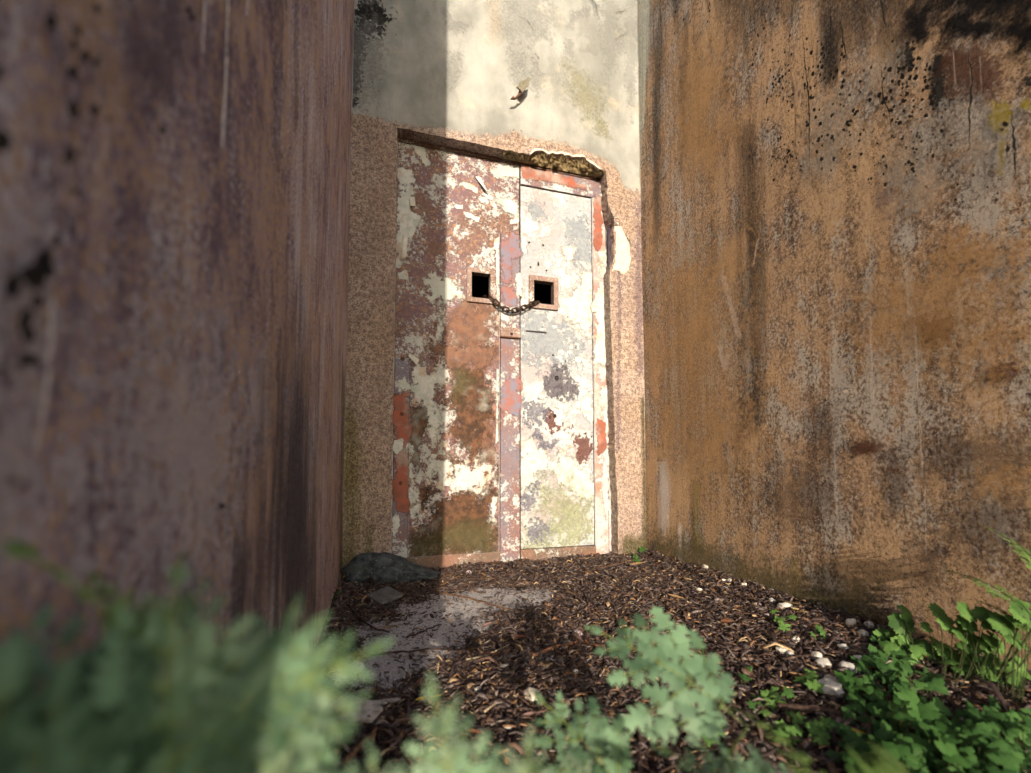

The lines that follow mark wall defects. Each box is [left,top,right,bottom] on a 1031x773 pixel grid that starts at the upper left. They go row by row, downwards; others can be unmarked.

damp [352,0,399,108]
damp [821,0,1031,114]
peeling [391,144,631,545]
corrosion [409,298,499,557]
damp [660,466,681,560]